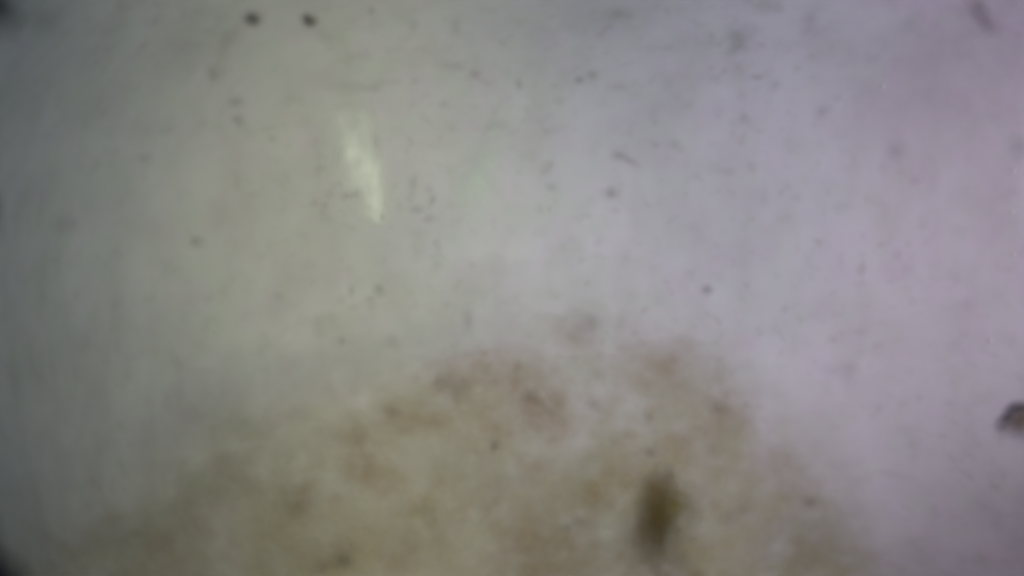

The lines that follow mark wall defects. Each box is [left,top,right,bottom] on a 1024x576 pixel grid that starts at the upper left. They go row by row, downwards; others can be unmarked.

damp [256,397,508,576]
damp [528,436,757,576]